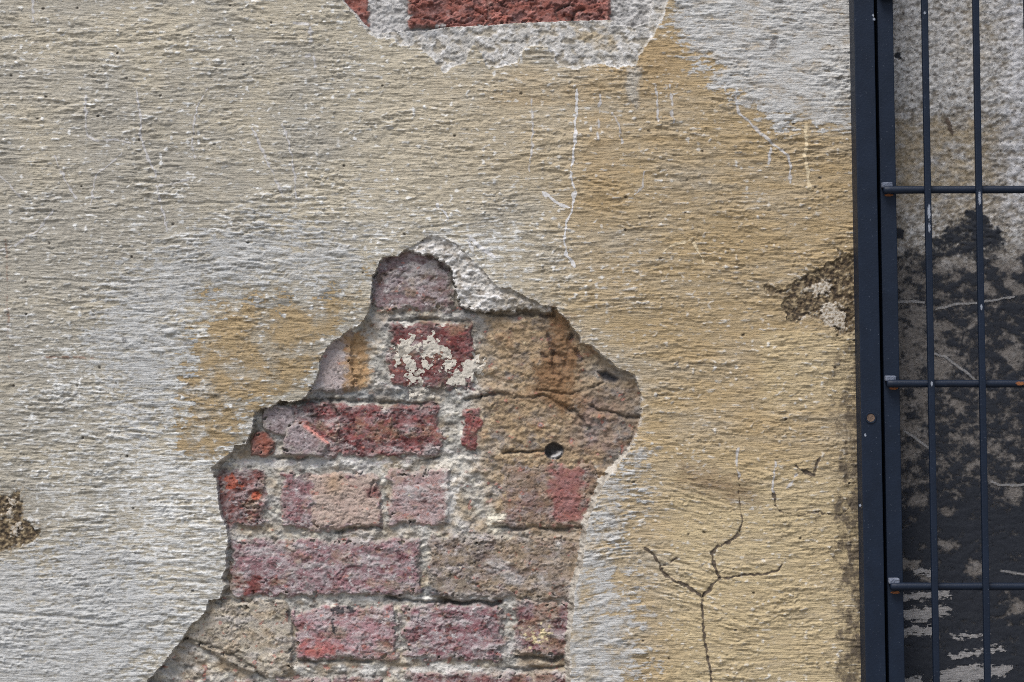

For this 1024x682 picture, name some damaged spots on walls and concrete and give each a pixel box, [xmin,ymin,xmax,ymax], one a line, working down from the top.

flaking render [342,0,851,133]
flaking render [762,248,855,338]
flaking render [0,489,42,553]
flaking render [147,235,642,682]
crack [643,448,783,682]